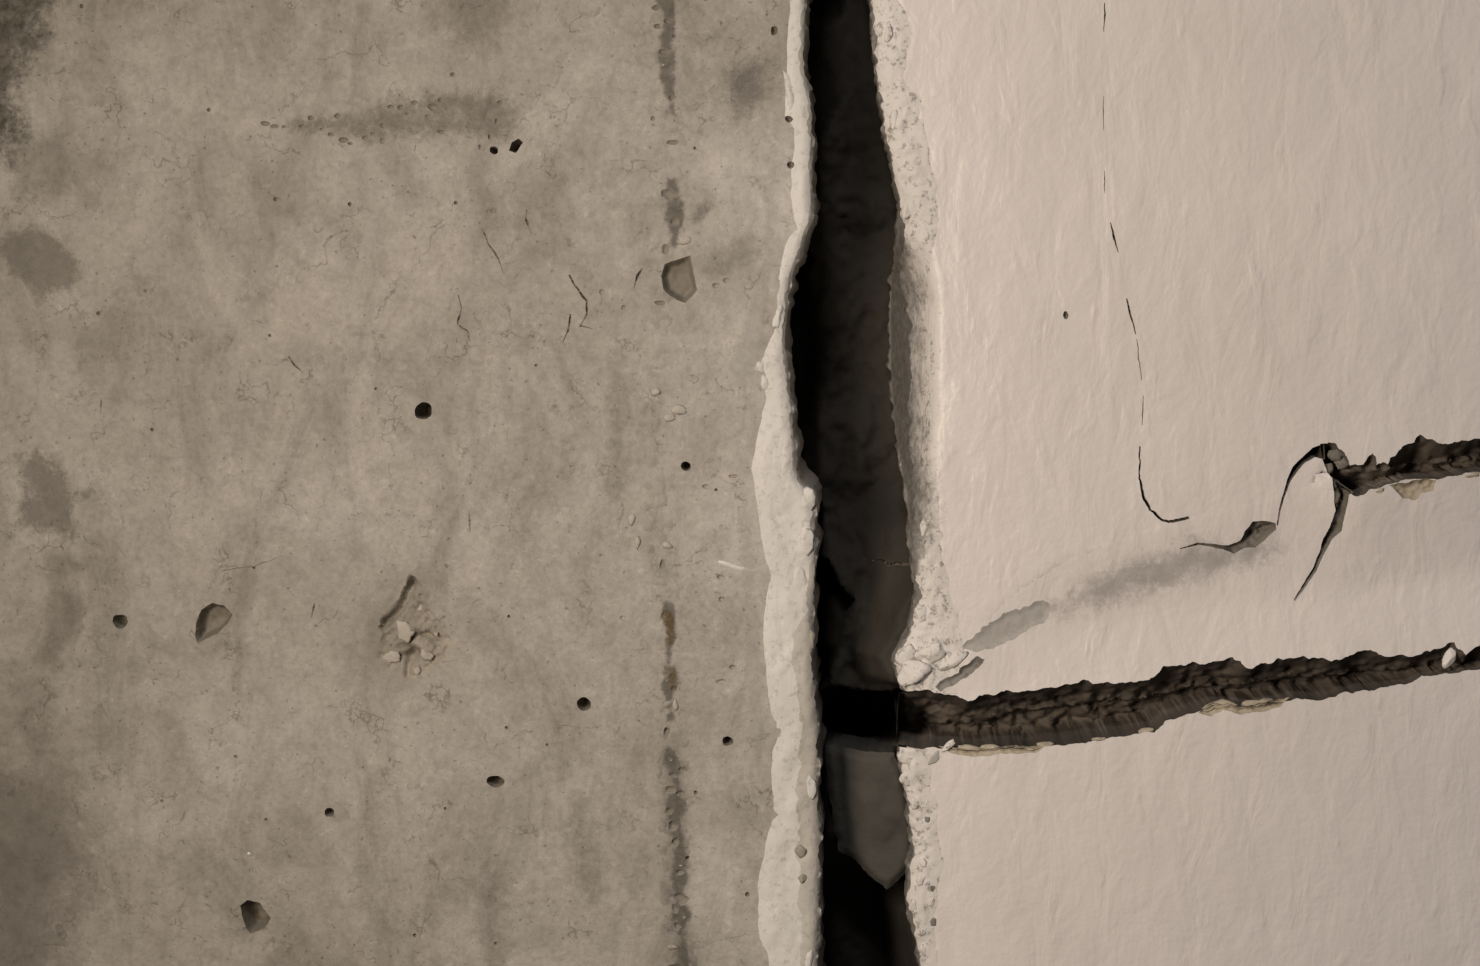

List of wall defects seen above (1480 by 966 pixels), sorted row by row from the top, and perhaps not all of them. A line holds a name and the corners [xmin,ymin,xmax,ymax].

spalling [376,573,452,681]
crack [790,0,1480,966]